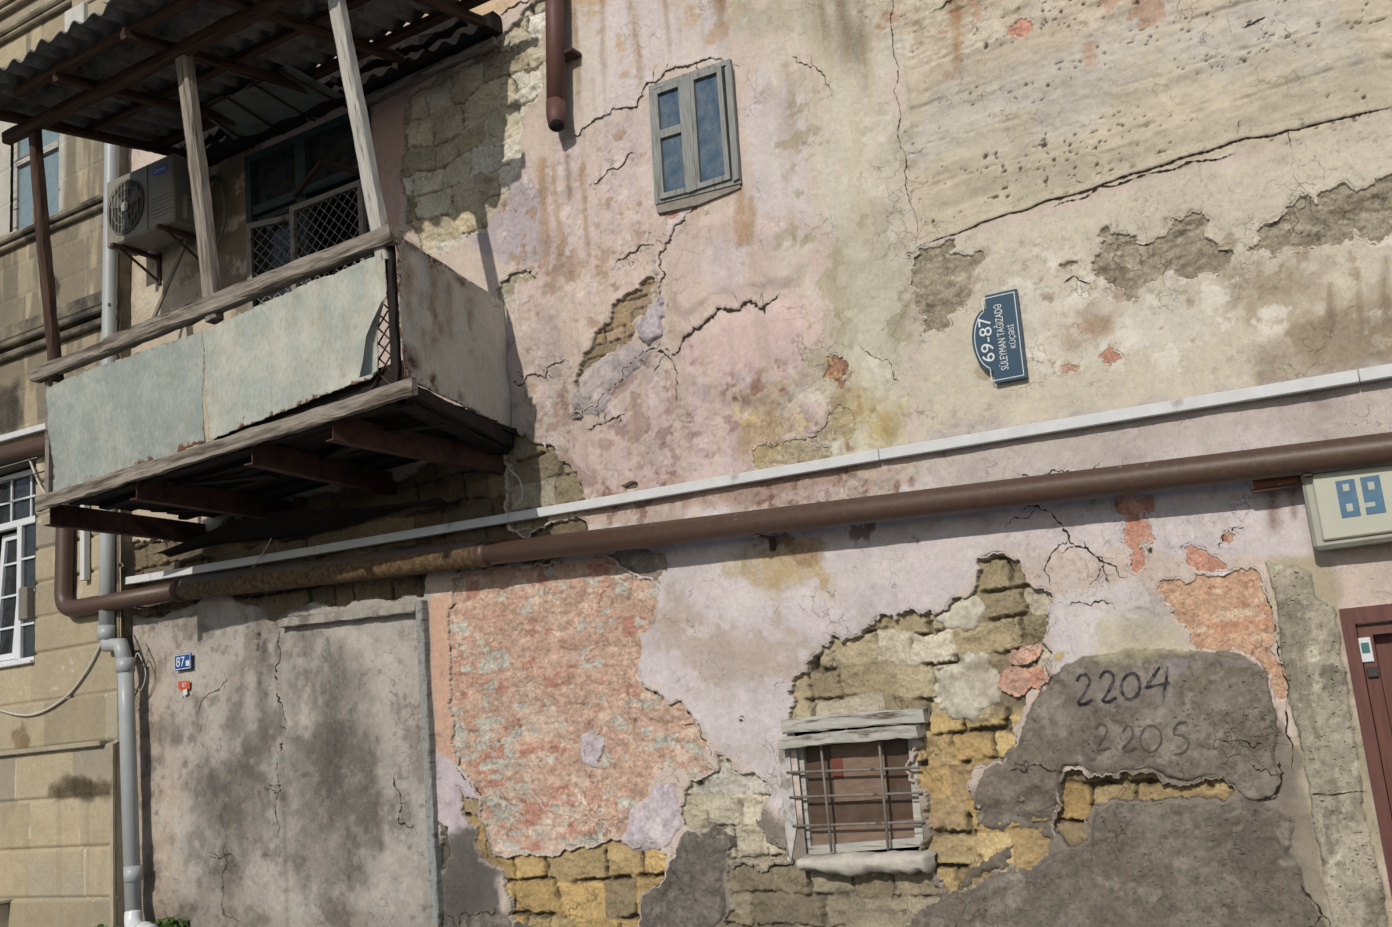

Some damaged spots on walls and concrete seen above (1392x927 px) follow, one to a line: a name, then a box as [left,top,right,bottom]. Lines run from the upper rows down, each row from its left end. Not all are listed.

flaking render [397,0,546,257]
crack [590,149,635,185]
flaking render [571,275,662,391]
crack [571,51,741,139]
crack [582,207,780,430]
flaking render [906,236,987,337]
crack [890,0,1392,247]
flaking render [1057,171,1392,304]
flaking render [132,431,589,589]
crack [1007,460,1125,609]
peeling [1111,493,1289,703]
peeling [133,548,1236,927]